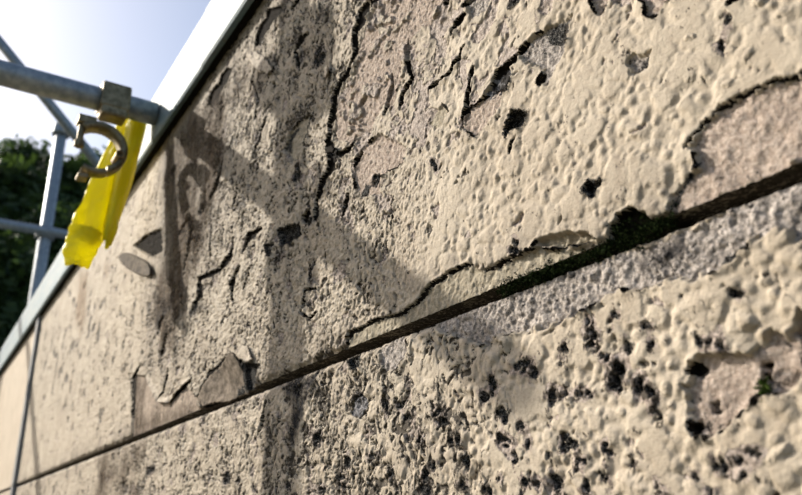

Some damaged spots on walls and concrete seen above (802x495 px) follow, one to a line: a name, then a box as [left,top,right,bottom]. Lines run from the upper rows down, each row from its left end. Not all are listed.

crack [208,67,232,107]
crack [254,0,300,47]
crack [313,0,379,222]
crack [383,0,531,128]
peeling [464,70,528,154]
peeling [609,72,802,241]
water stain [153,103,224,350]
crack [183,219,262,313]
peeling [345,233,596,371]
spalling [440,183,802,422]
peeling [134,344,260,436]
peeling [685,320,802,442]